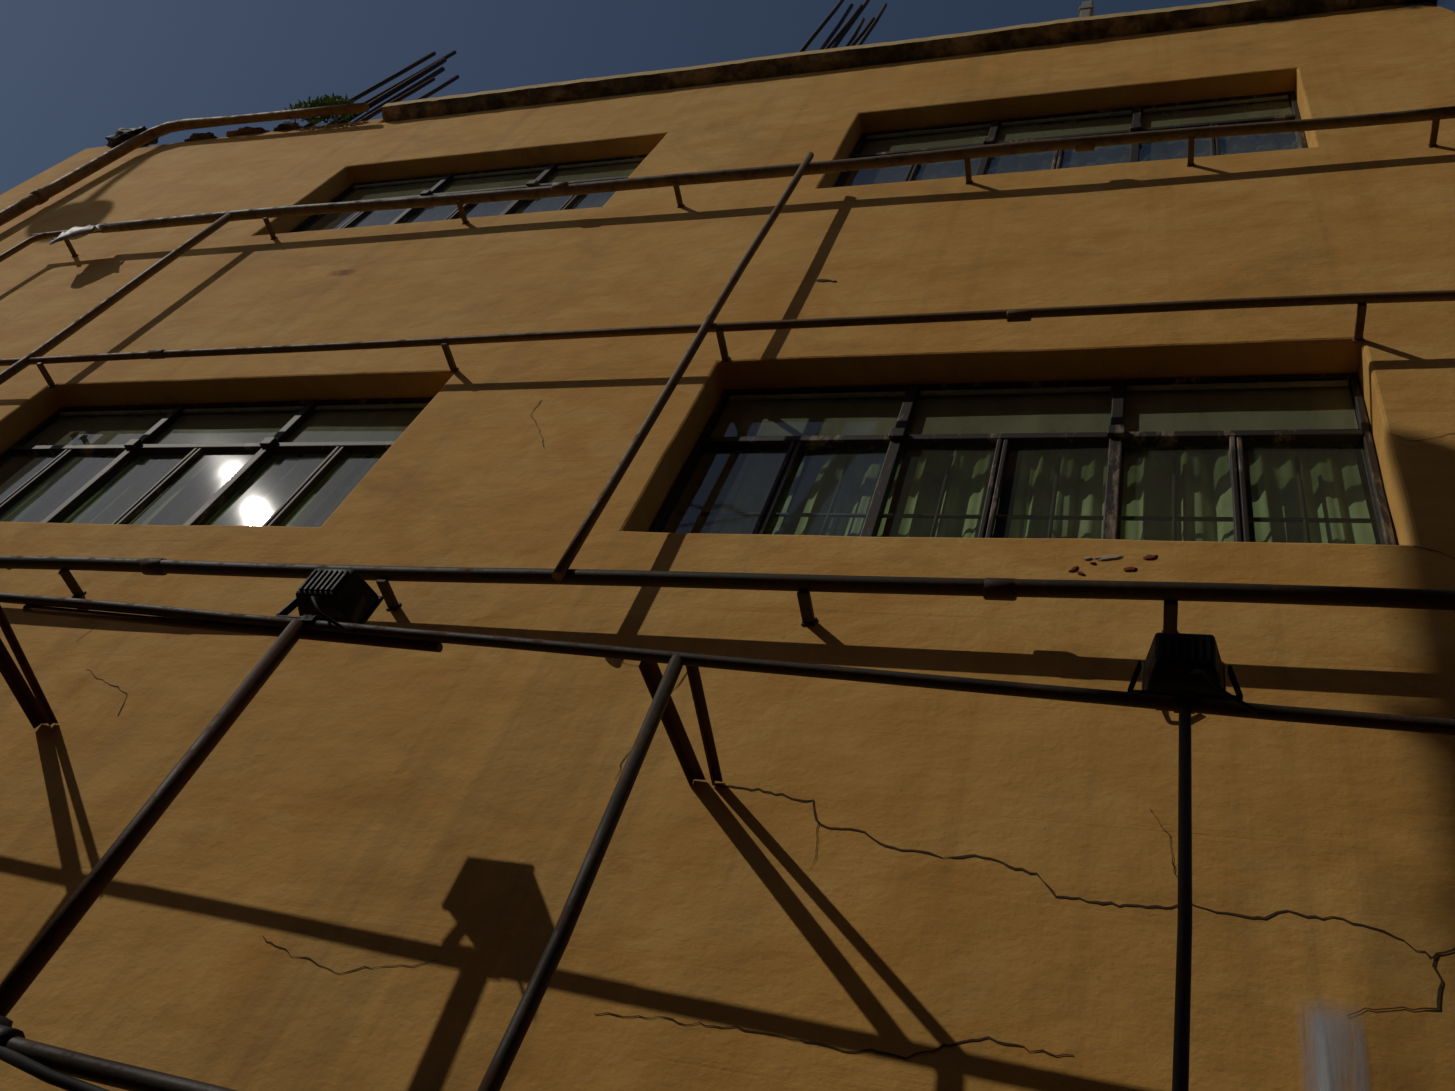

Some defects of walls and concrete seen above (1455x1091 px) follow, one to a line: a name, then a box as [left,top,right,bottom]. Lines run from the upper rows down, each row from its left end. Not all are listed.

crack [714,783,1455,1016]
crack [263,936,439,974]
crack [594,1012,1074,1060]